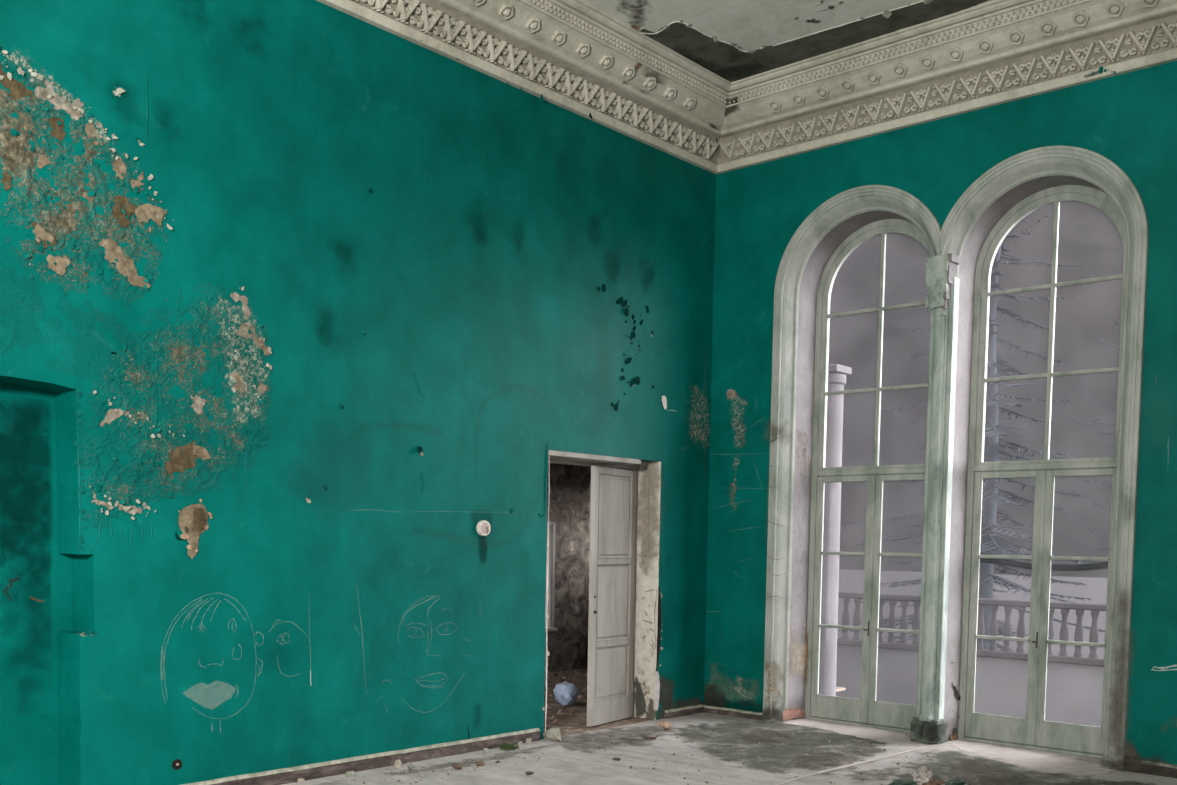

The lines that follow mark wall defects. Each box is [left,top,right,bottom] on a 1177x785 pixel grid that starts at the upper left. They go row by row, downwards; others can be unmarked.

peeling [0,44,274,559]
peeling [610,297,710,452]